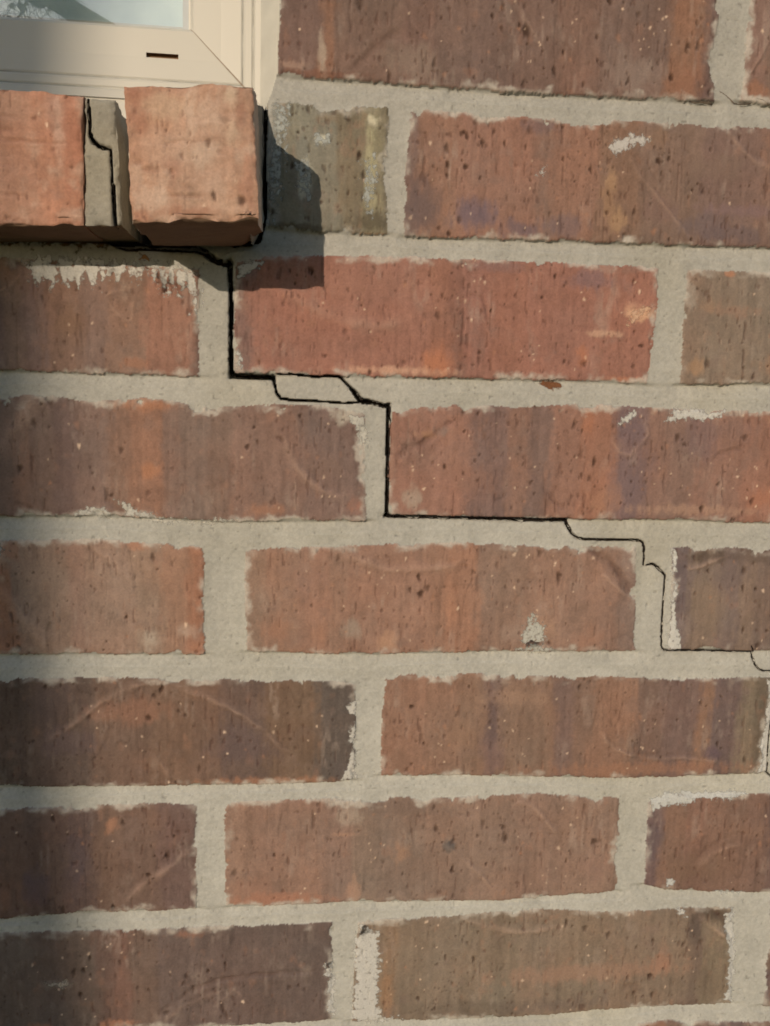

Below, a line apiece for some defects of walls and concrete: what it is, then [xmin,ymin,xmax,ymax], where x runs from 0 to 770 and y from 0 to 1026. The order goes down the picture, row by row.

crack [87,98,770,671]
crack [762,722,770,776]